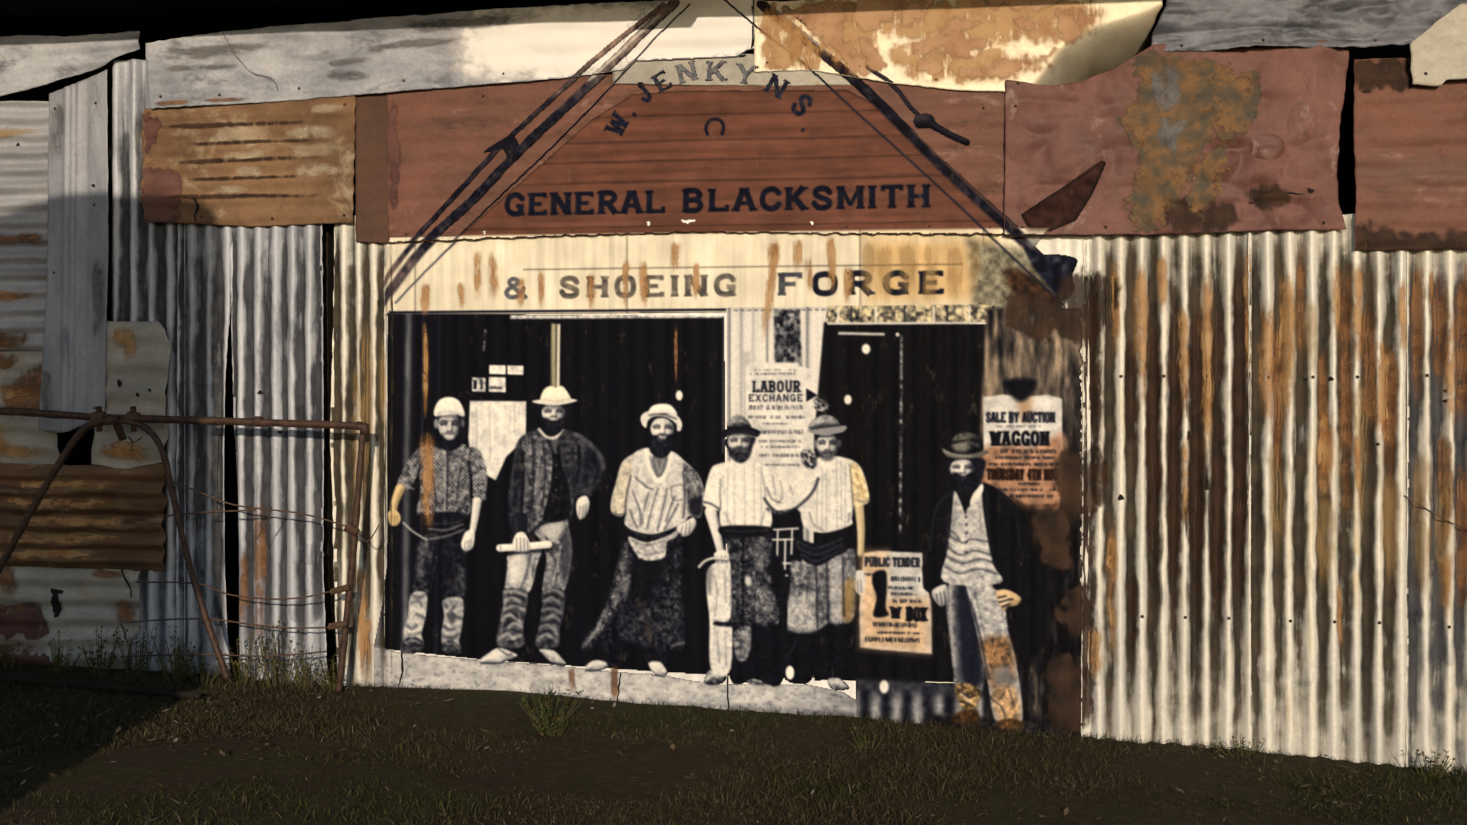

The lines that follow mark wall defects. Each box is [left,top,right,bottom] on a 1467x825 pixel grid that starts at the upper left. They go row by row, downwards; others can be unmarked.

crack [223,32,278,91]
corrosion [760,0,1102,83]
corrosion [140,95,356,226]
corrosion [421,285,430,311]
corrosion [458,254,498,305]
corrosion [518,273,544,304]
corrosion [622,264,648,302]
corrosion [764,239,852,326]
corrosion [1317,269,1467,506]
corrosion [0,441,169,666]
corrosion [1006,249,1305,734]
corrosion [1438,438,1467,607]